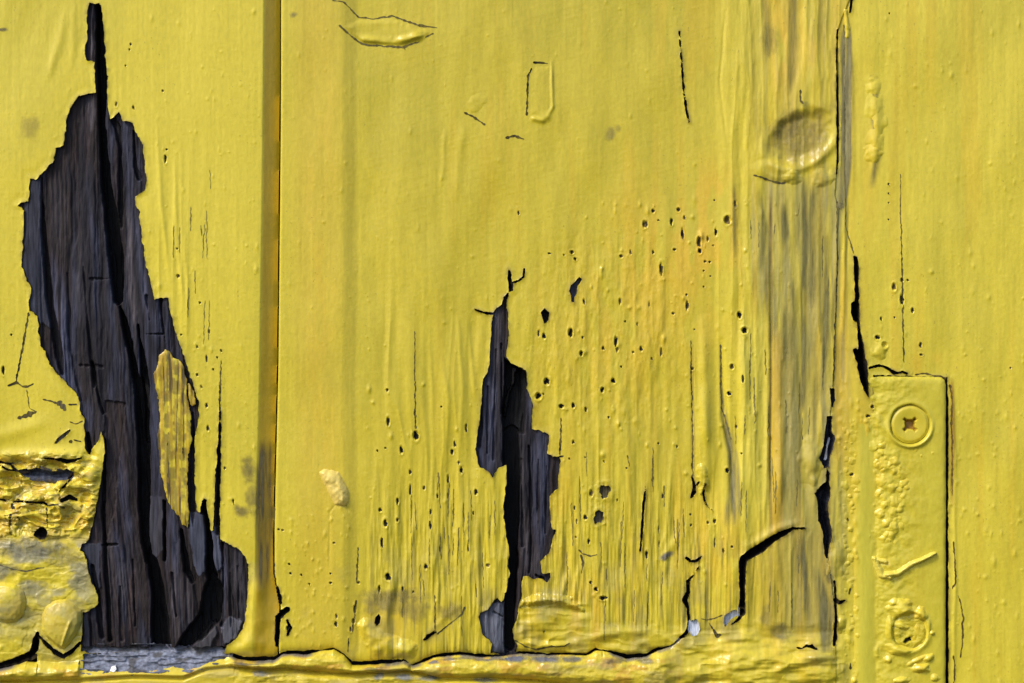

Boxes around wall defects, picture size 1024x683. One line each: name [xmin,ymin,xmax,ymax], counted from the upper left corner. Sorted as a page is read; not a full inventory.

crack [0,312,82,535]
peeling [18,3,249,648]
peeling [465,270,571,656]
crack [559,0,954,669]
crack [952,541,964,683]